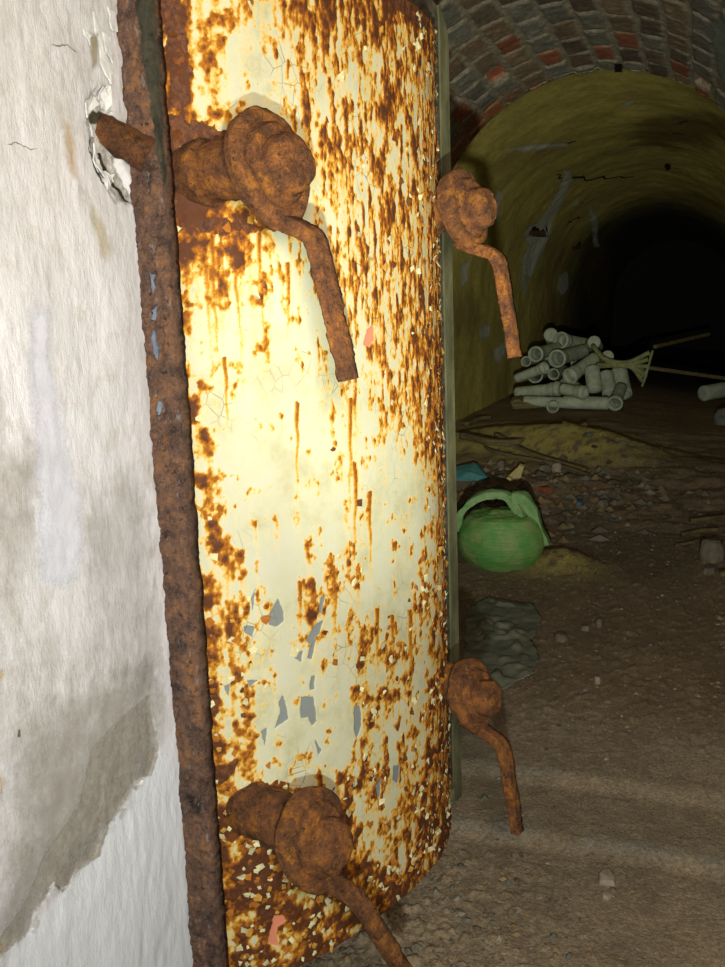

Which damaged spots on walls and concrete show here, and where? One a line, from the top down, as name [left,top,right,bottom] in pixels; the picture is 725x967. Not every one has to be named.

flaking render [83,7,132,203]
crack [556,174,628,182]
peeling [322,6,452,909]
peeling [0,691,158,957]
peeling [213,733,238,770]
peeling [209,636,258,718]
peeling [217,807,350,967]